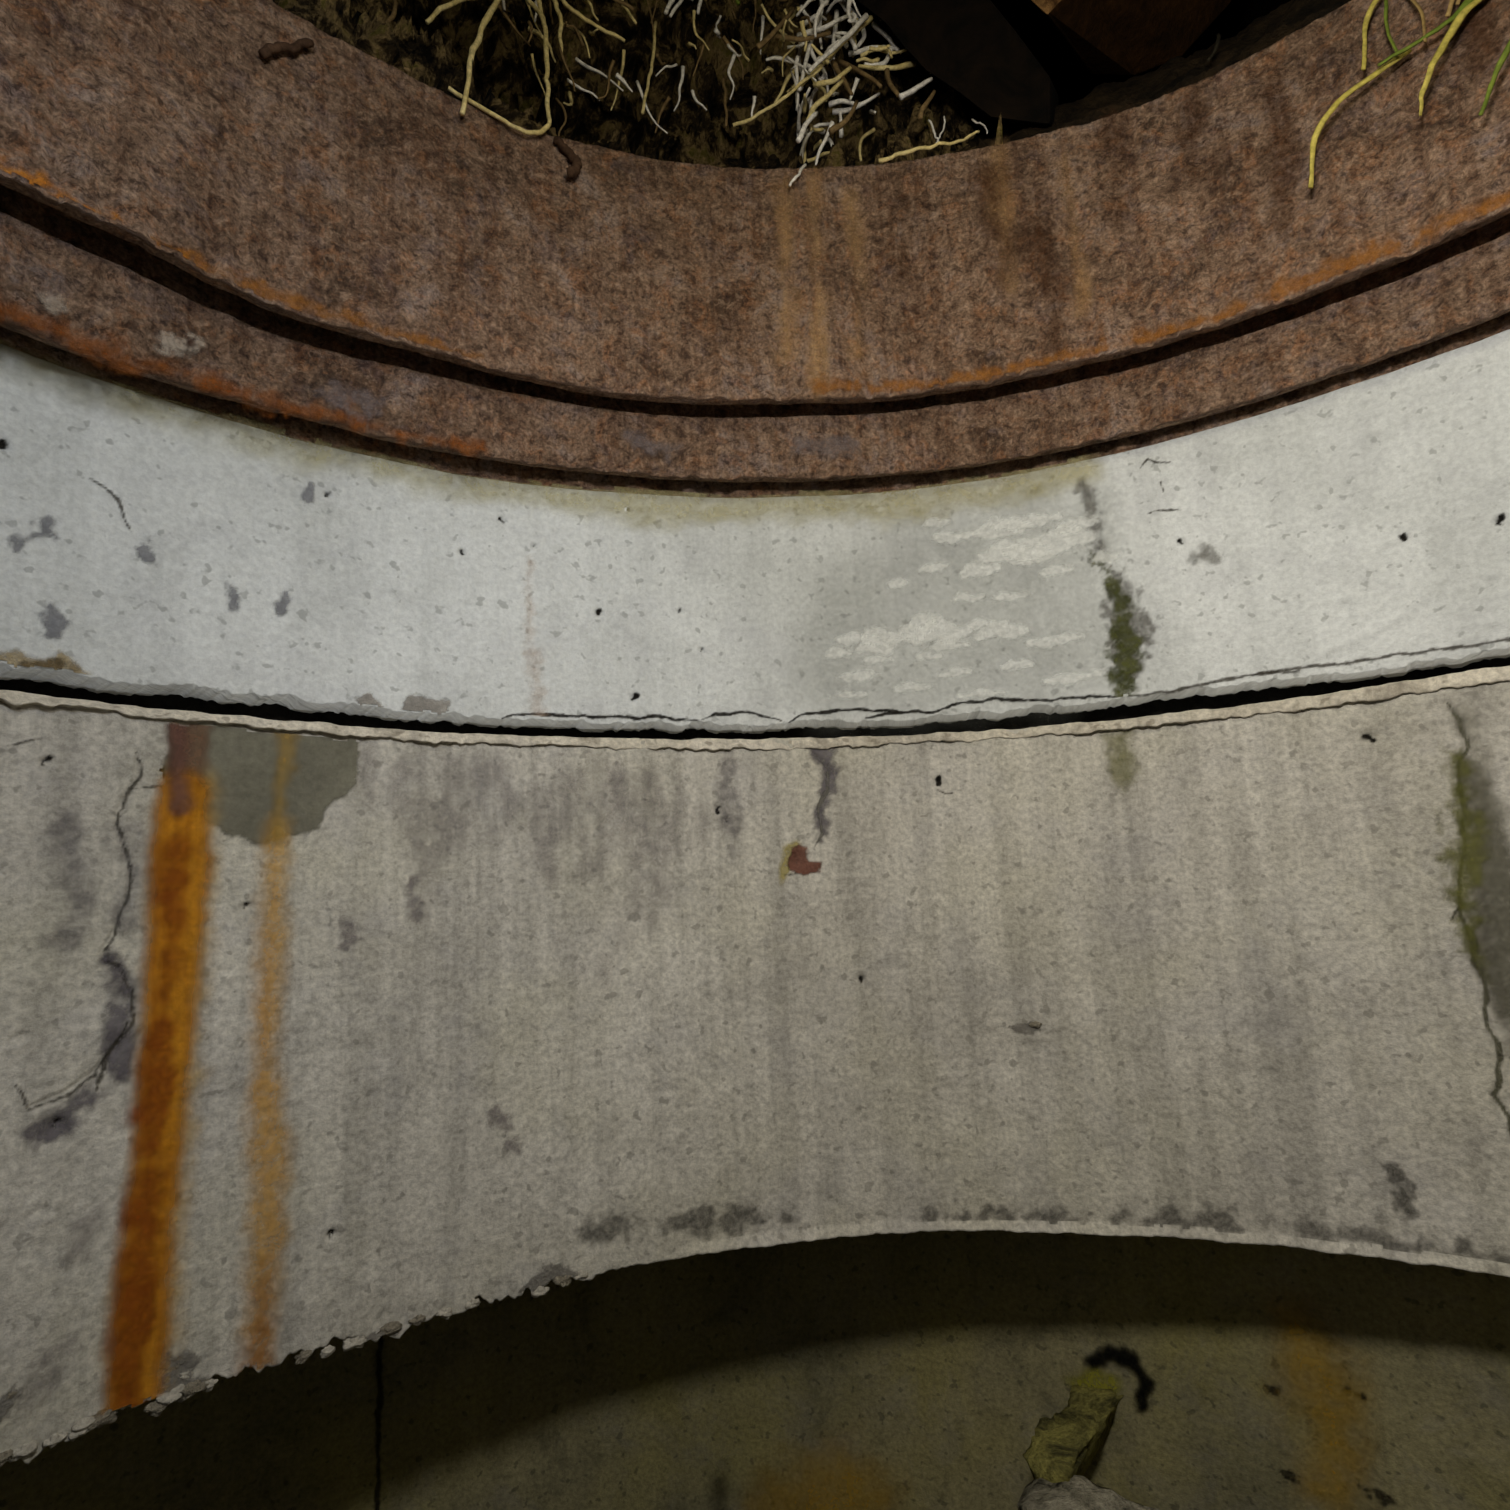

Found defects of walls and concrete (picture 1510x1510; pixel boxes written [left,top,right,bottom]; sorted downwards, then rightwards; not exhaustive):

corrosion [5,171,95,212]
corrosion [193,373,375,430]
damp [1078,483,1102,554]
damp [1102,573,1155,678]
damp [164,722,359,844]
crack [15,758,156,1142]
crack [1439,705,1510,1131]
corrosion [108,724,209,1411]